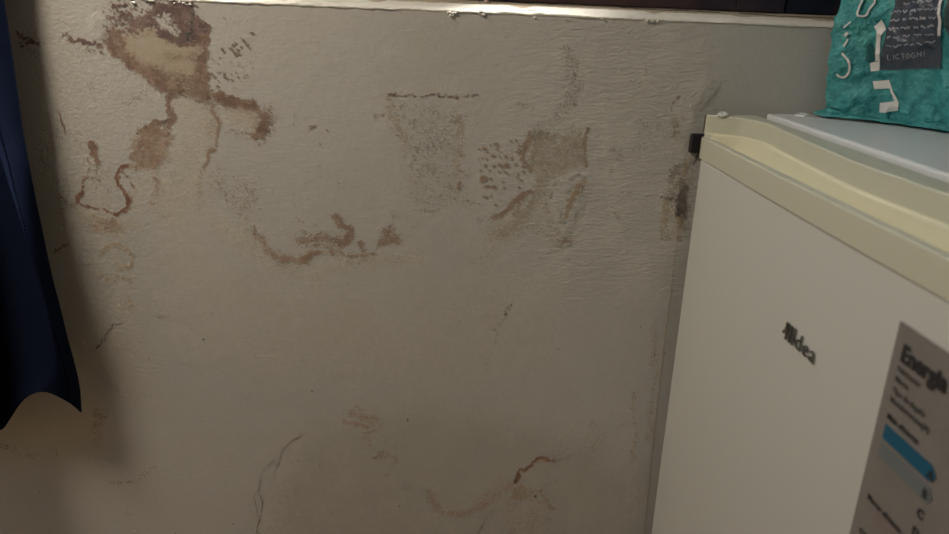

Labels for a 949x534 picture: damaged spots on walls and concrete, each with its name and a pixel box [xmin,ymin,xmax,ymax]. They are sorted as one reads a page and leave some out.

water stain [62,0,687,270]
water stain [660,153,702,241]